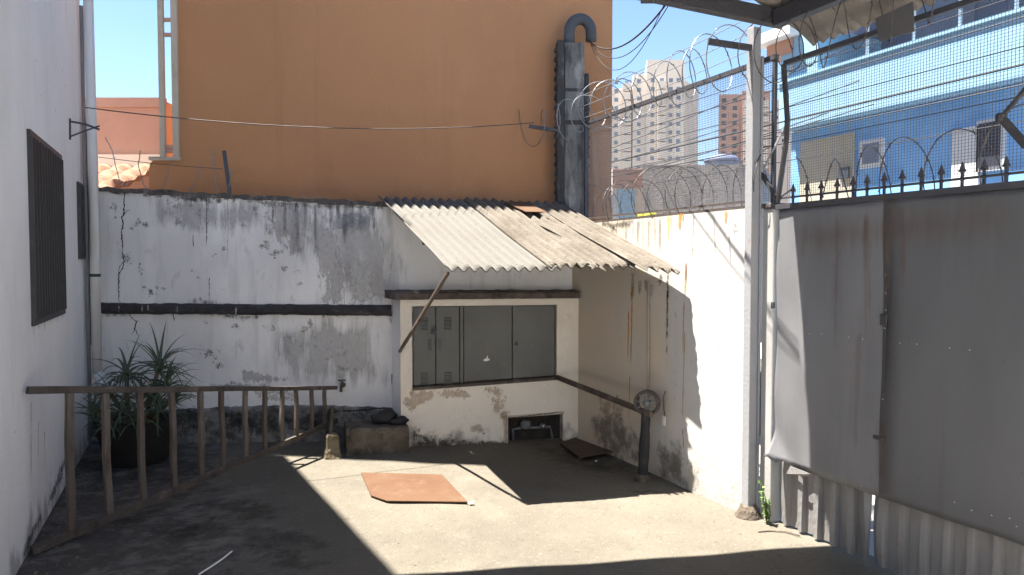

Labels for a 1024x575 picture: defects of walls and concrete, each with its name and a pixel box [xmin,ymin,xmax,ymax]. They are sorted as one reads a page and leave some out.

crack [118,194,139,336]
leakage [281,201,392,296]
peeling [243,370,294,400]
leakage [660,451,681,481]